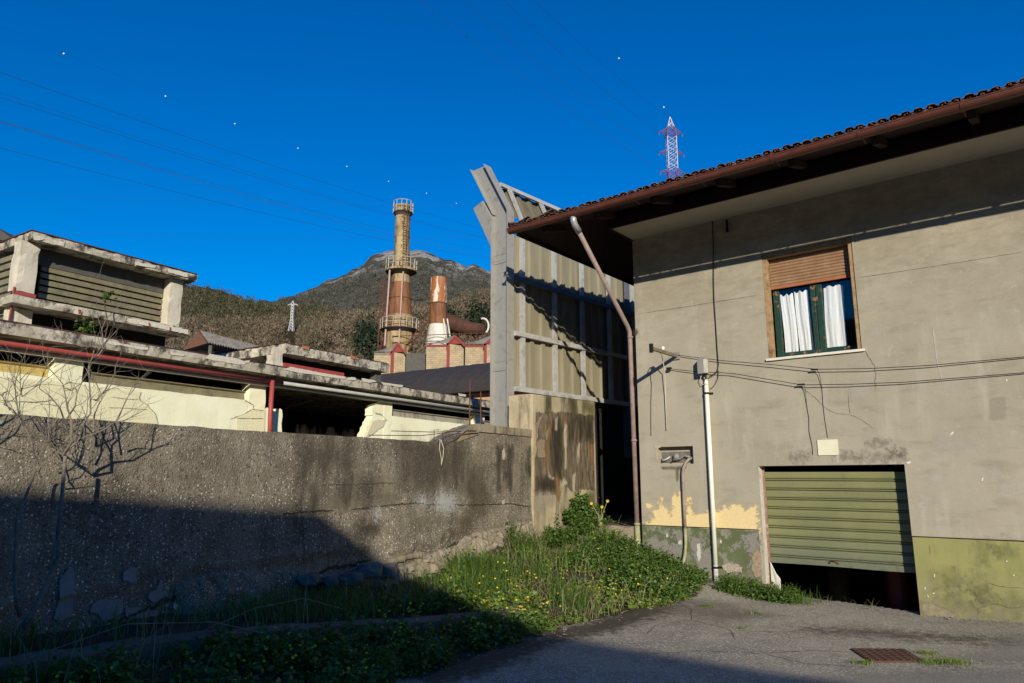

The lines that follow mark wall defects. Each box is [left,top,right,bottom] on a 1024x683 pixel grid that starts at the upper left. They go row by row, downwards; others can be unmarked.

damp [497,448,513,505]
peeling [643,491,763,582]